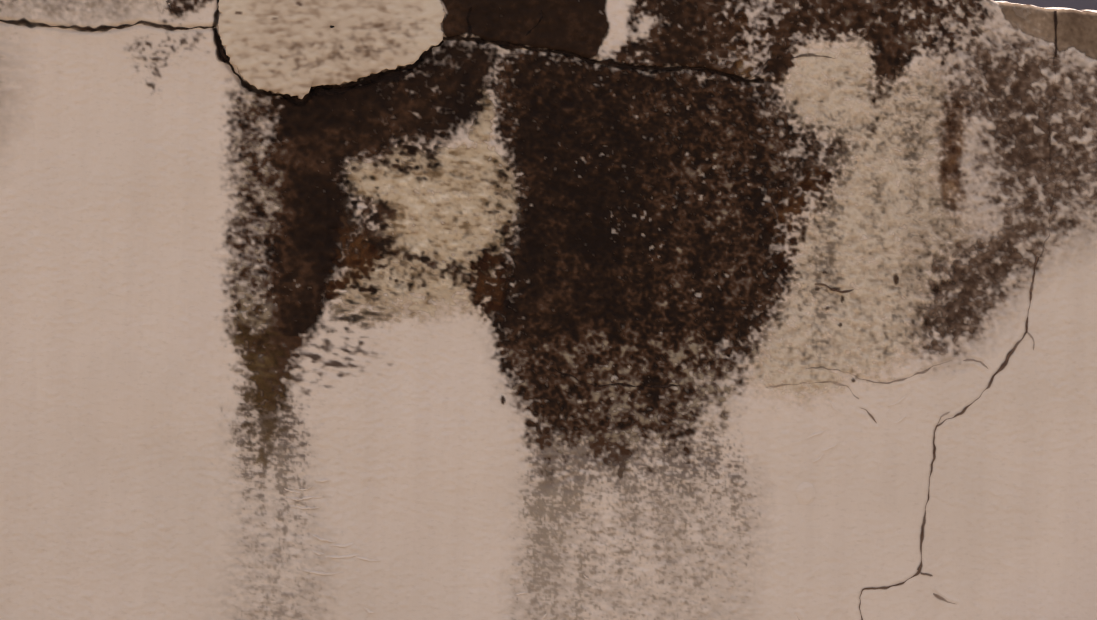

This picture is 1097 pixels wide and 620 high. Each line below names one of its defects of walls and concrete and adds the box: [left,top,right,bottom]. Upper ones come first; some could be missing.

peeling [217,0,446,99]
crack [0,0,836,105]
spalling [998,2,1097,60]
crack [1051,11,1059,57]
leakage [224,0,1097,526]
crack [835,369,927,384]
crack [859,256,1039,620]